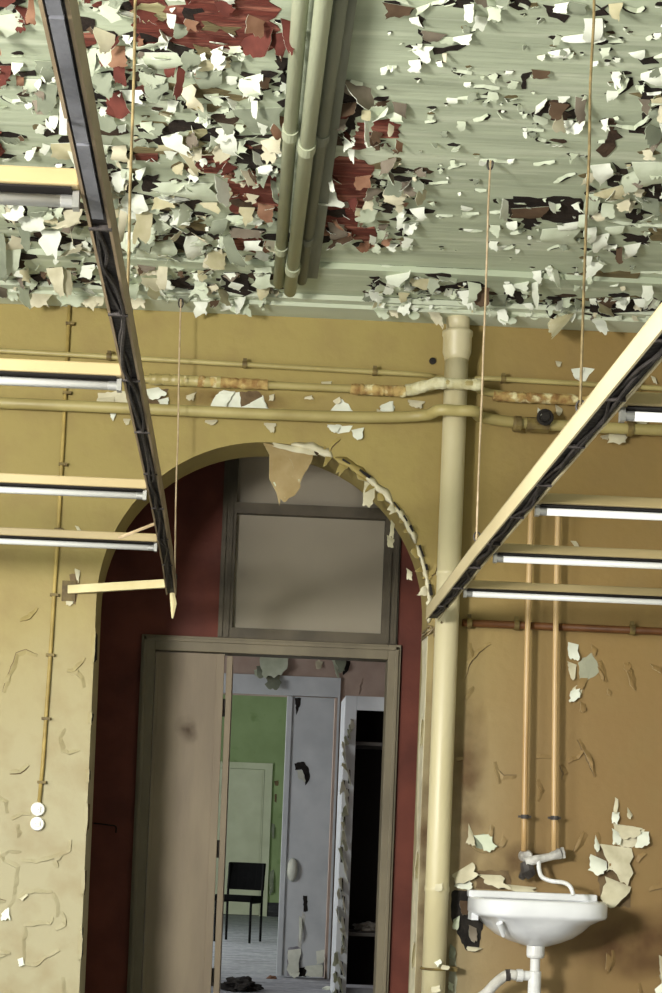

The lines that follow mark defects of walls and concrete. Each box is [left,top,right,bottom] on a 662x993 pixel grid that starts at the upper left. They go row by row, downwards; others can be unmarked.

peeling [0,0,36,38]
peeling [0,50,75,168]
peeling [78,0,295,318]
peeling [318,0,662,338]
peeling [0,202,105,312]
peeling [211,390,274,409]
peeling [263,423,433,605]
peeling [567,642,612,712]
peeling [287,719,355,993]
peeling [409,618,432,993]
peeling [573,797,650,908]
peeling [431,862,537,993]